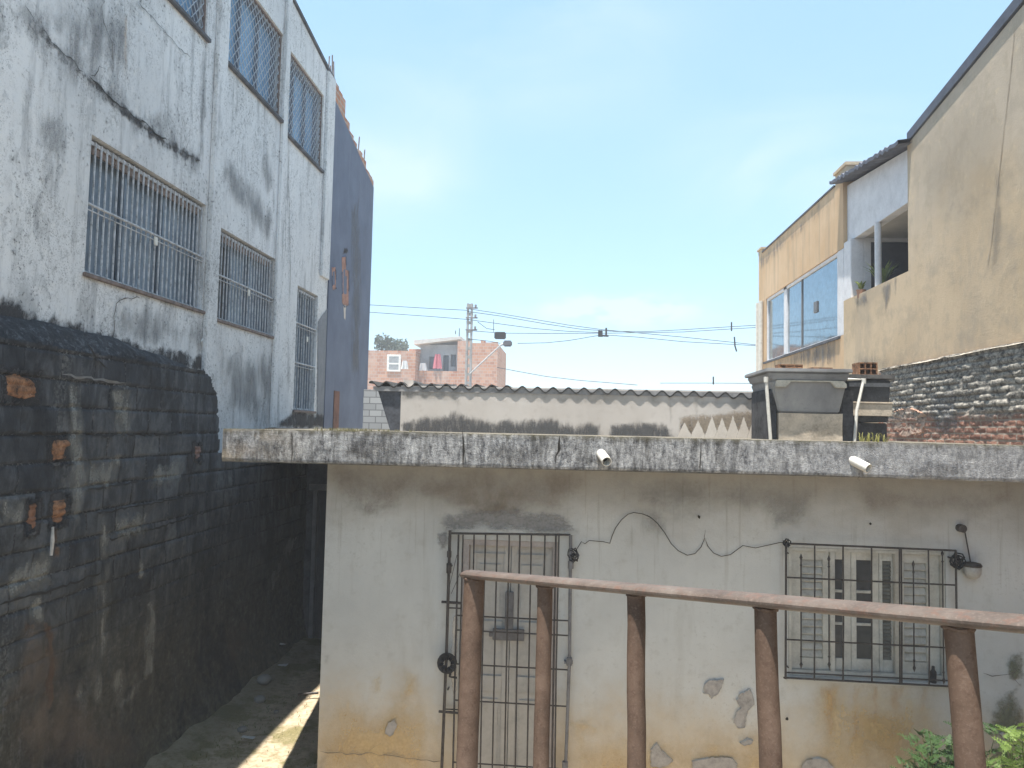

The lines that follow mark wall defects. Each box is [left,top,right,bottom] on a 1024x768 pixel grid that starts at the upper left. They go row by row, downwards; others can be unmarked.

crack [26,7,200,161]
spalling [0,364,43,408]
spalling [44,434,75,468]
spalling [23,491,72,540]
peeling [703,678,724,699]
peeling [733,688,754,746]